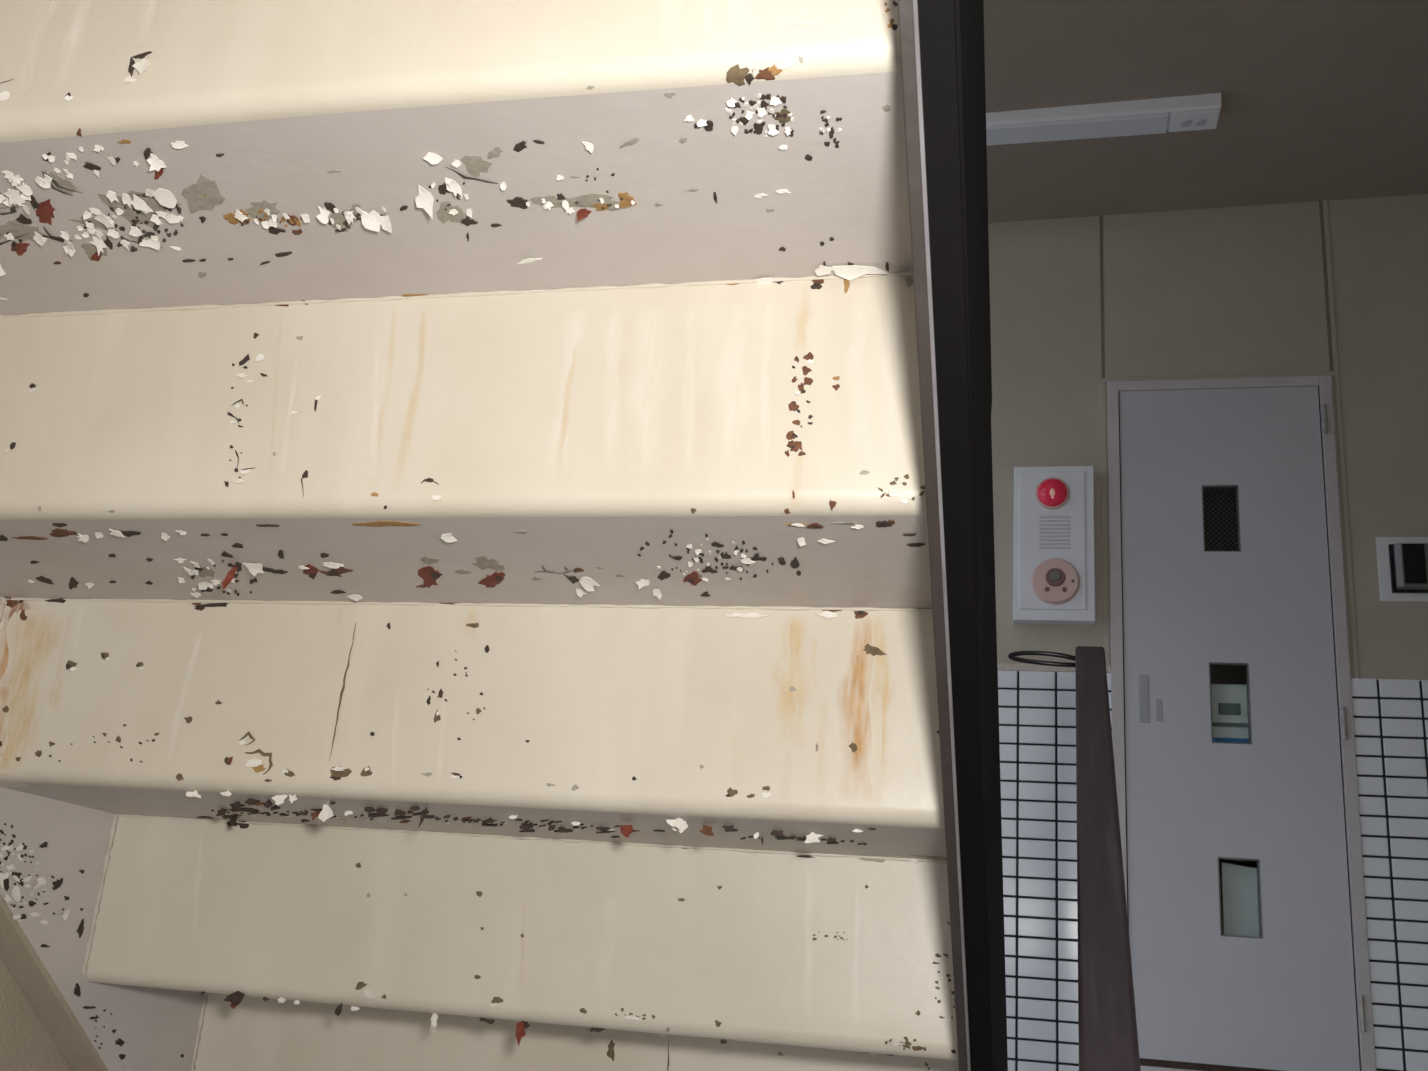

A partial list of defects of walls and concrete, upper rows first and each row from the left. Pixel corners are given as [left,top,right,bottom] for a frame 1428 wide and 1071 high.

peeling [679,93,794,150]
peeling [820,110,842,148]
peeling [0,128,637,278]
peeling [0,510,141,543]
peeling [161,530,363,611]
peeling [636,530,835,600]
corrosion [0,560,116,788]
crack [329,624,358,761]
peeling [426,689,448,723]
corrosion [724,610,897,811]
peeling [176,731,886,863]
peeling [0,823,84,938]